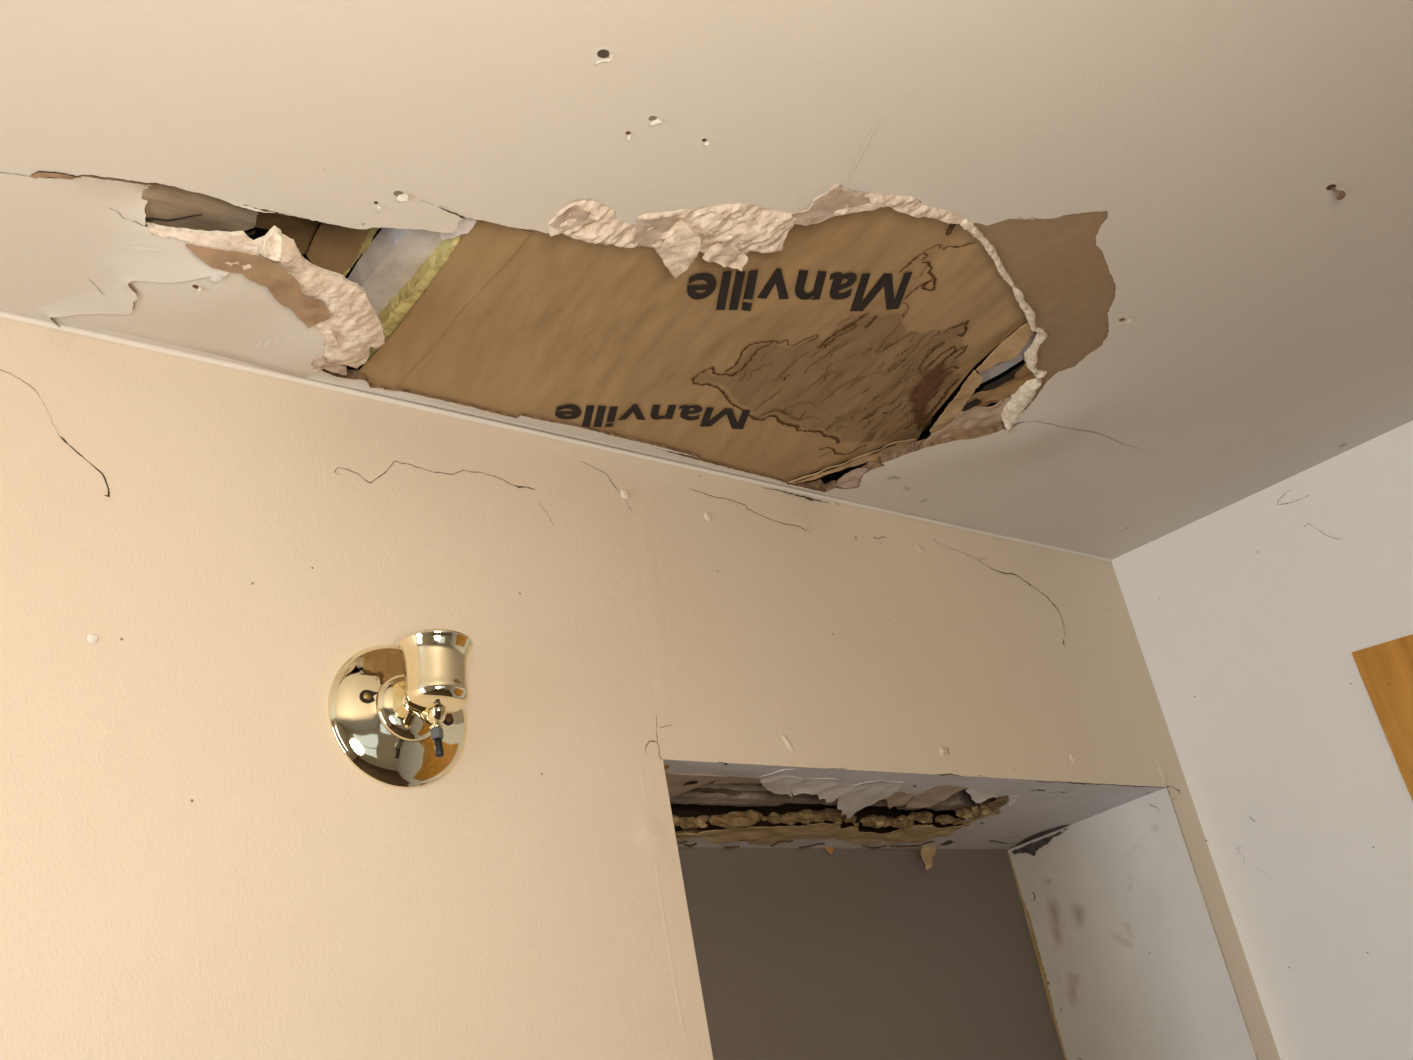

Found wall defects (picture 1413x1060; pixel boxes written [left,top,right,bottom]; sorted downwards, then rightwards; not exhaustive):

spalling [244,227,269,247]
spalling [345,206,383,279]
peeling [33,247,230,326]
leakage [691,224,973,457]
crack [0,369,110,497]
spalling [798,322,1037,484]
crack [335,461,554,526]
crack [935,540,1066,647]
peeling [670,769,1020,834]
peeling [920,846,938,871]